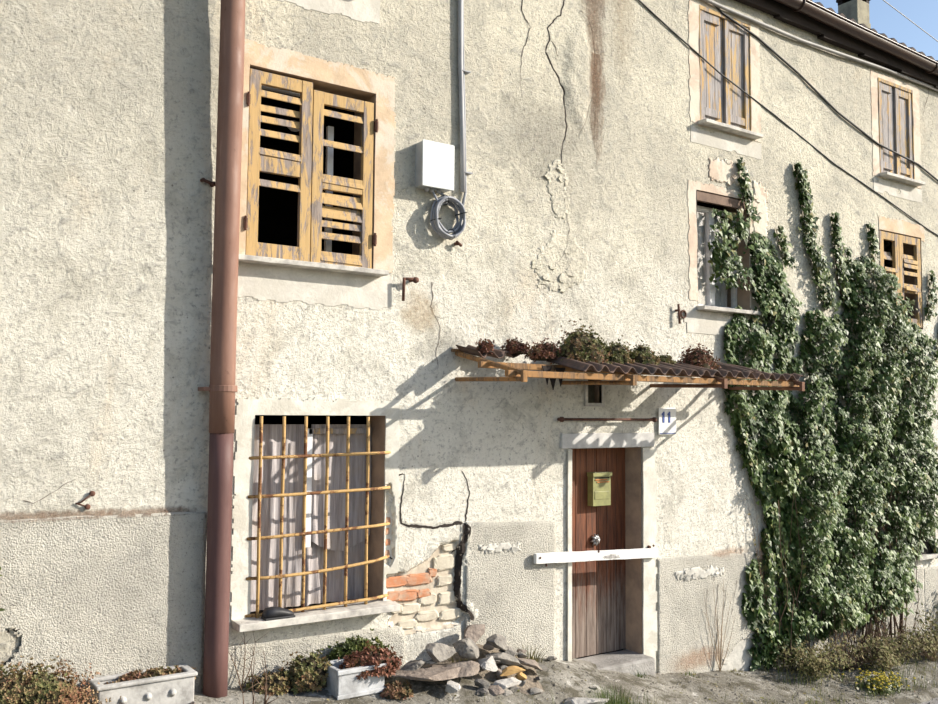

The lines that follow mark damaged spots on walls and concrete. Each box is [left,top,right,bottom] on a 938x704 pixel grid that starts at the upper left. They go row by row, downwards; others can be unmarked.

water stain [588,0,601,108]
crack [520,0,571,272]
spalling [383,485,466,635]
crack [399,470,479,620]